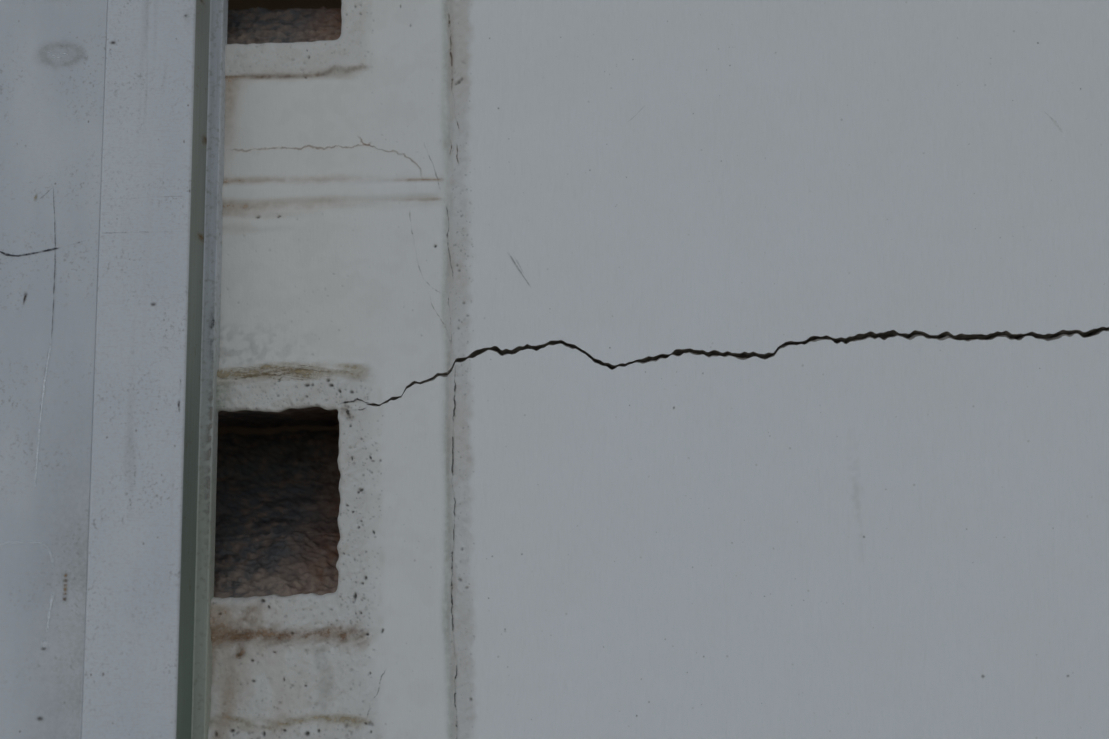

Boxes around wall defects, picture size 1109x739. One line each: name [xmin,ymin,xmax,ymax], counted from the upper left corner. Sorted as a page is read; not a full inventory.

crack [344,327,1109,630]